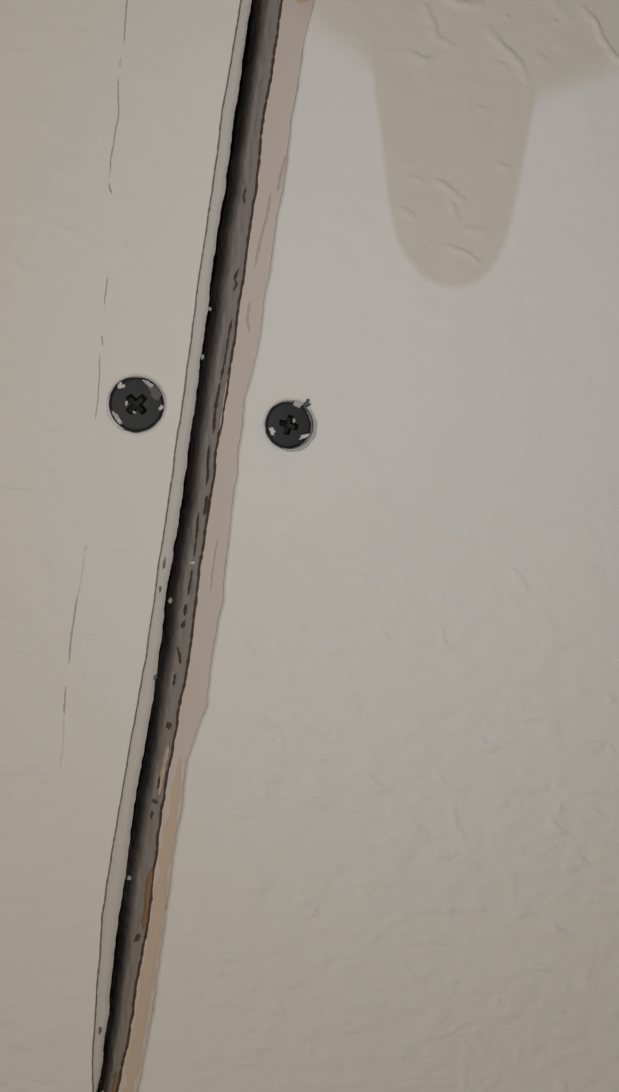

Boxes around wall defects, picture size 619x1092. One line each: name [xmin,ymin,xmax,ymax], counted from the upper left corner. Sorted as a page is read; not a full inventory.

crack [92,0,283,1092]